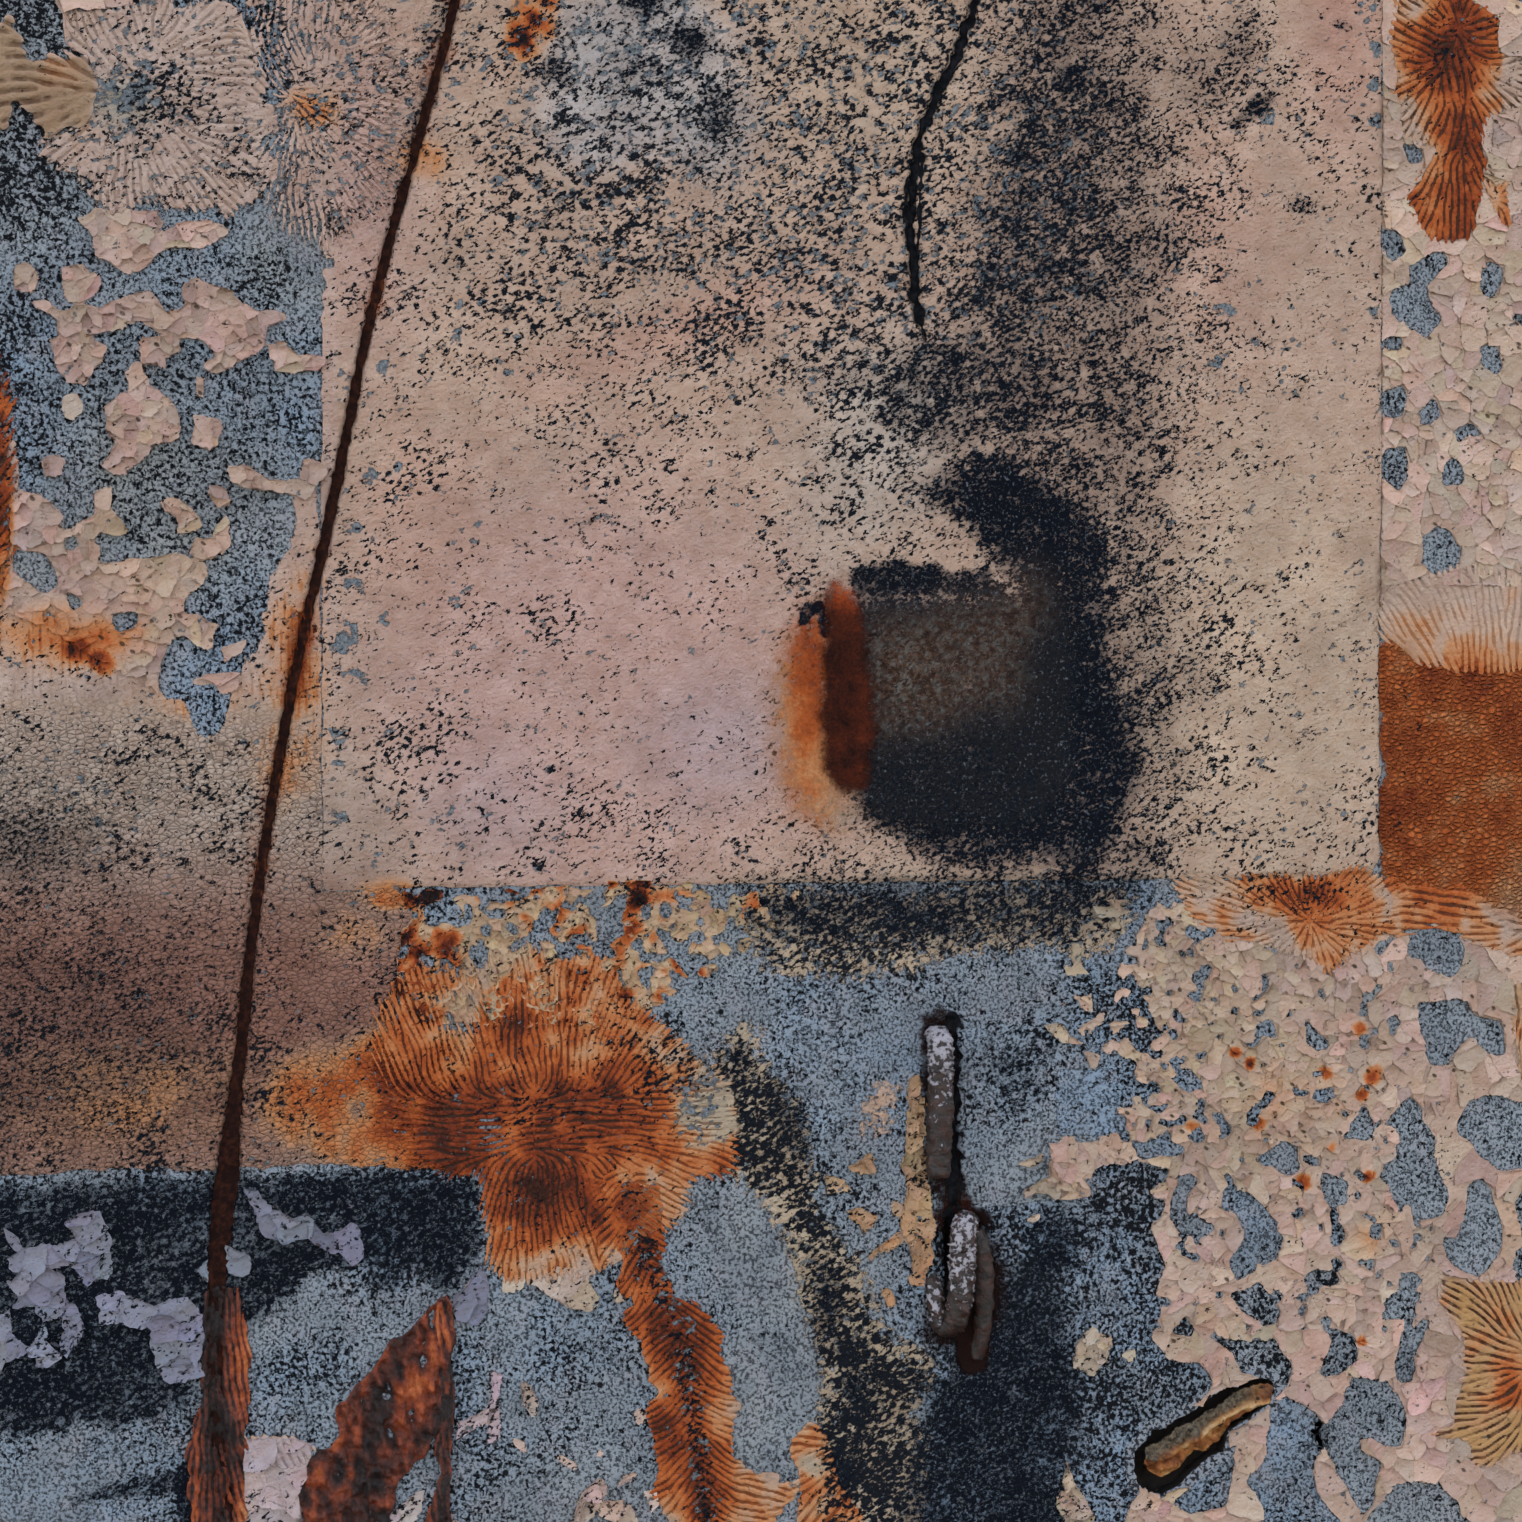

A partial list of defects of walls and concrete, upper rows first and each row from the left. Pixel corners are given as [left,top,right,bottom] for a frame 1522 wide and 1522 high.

peeling [2,207,328,694]
damp [497,0,756,154]
crack [902,0,980,343]
damp [725,0,1286,1159]
peeling [1380,67,1522,605]
corrosion [1389,0,1522,244]
corrosion [1170,640,1522,977]
peeling [0,1210,205,1384]
corrosion [369,941,863,1522]
damp [798,1196,1125,1522]
peeling [825,880,1522,1522]
corrosion [1124,1367,1284,1499]